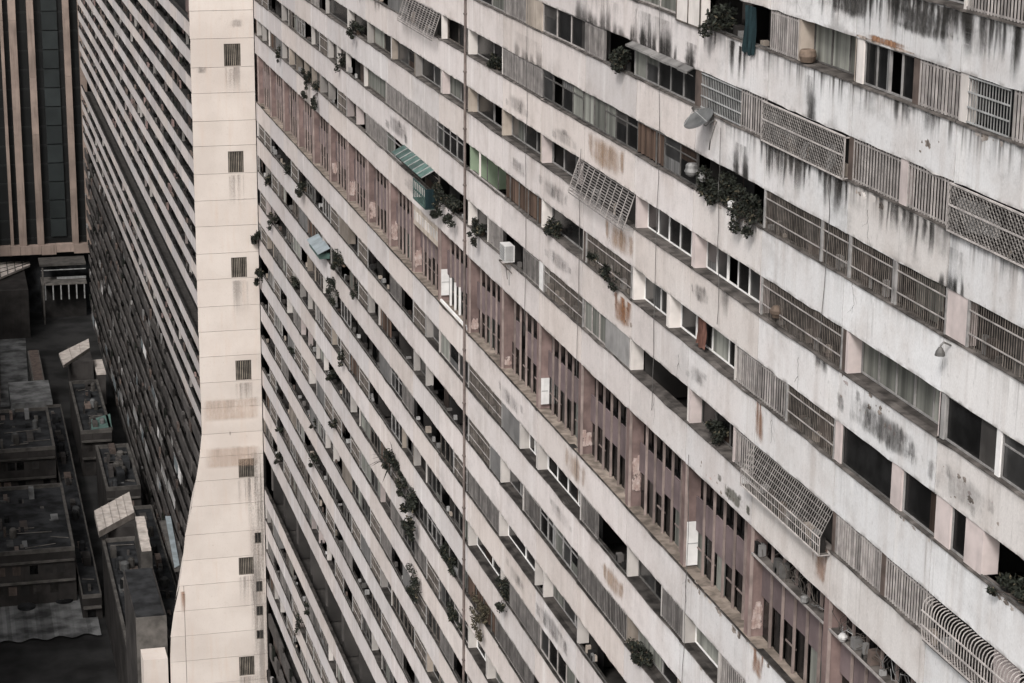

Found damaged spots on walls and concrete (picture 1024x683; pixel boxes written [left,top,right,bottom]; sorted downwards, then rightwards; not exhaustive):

damp [576,8,694,68]
damp [822,0,1021,57]
damp [760,140,847,202]
damp [880,198,934,239]
rust [615,292,630,324]
damp [939,277,963,296]
damp [864,408,906,451]